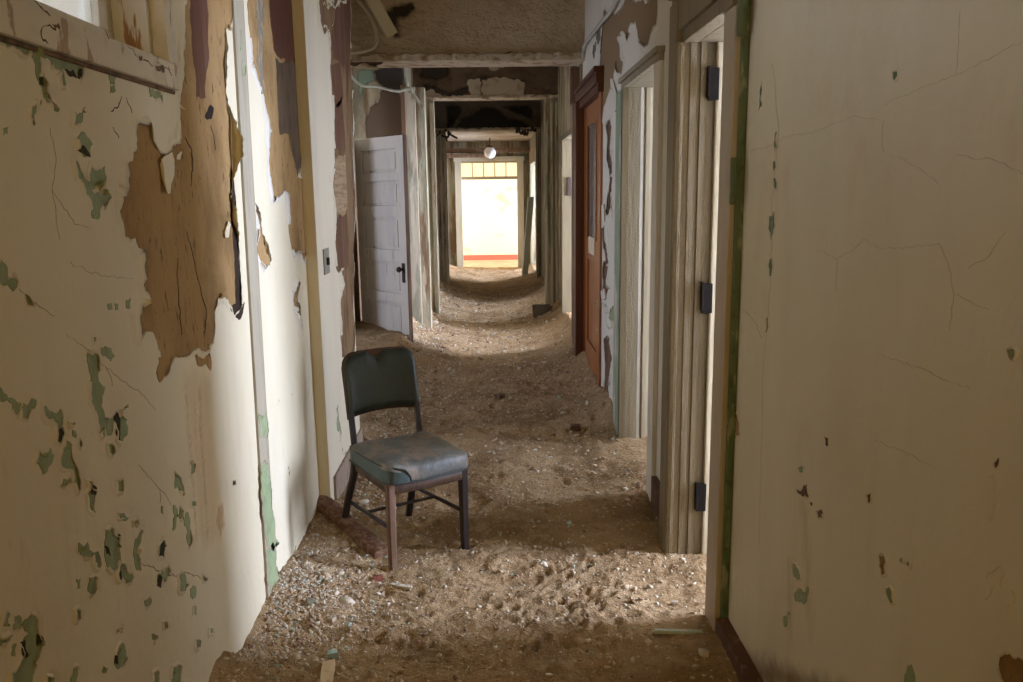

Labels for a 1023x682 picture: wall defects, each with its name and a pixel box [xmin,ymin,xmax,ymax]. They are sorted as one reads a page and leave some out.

flaking render [0,0,308,382]
flaking render [317,0,585,360]
flaking render [596,0,660,398]
peeling [0,382,98,518]
peeling [87,333,129,459]
peeling [76,513,144,599]
peeling [143,536,208,616]
peeling [161,460,197,549]
peeling [258,411,269,439]
peeling [260,459,286,593]
peeling [0,606,54,682]
flaking render [997,647,1023,682]